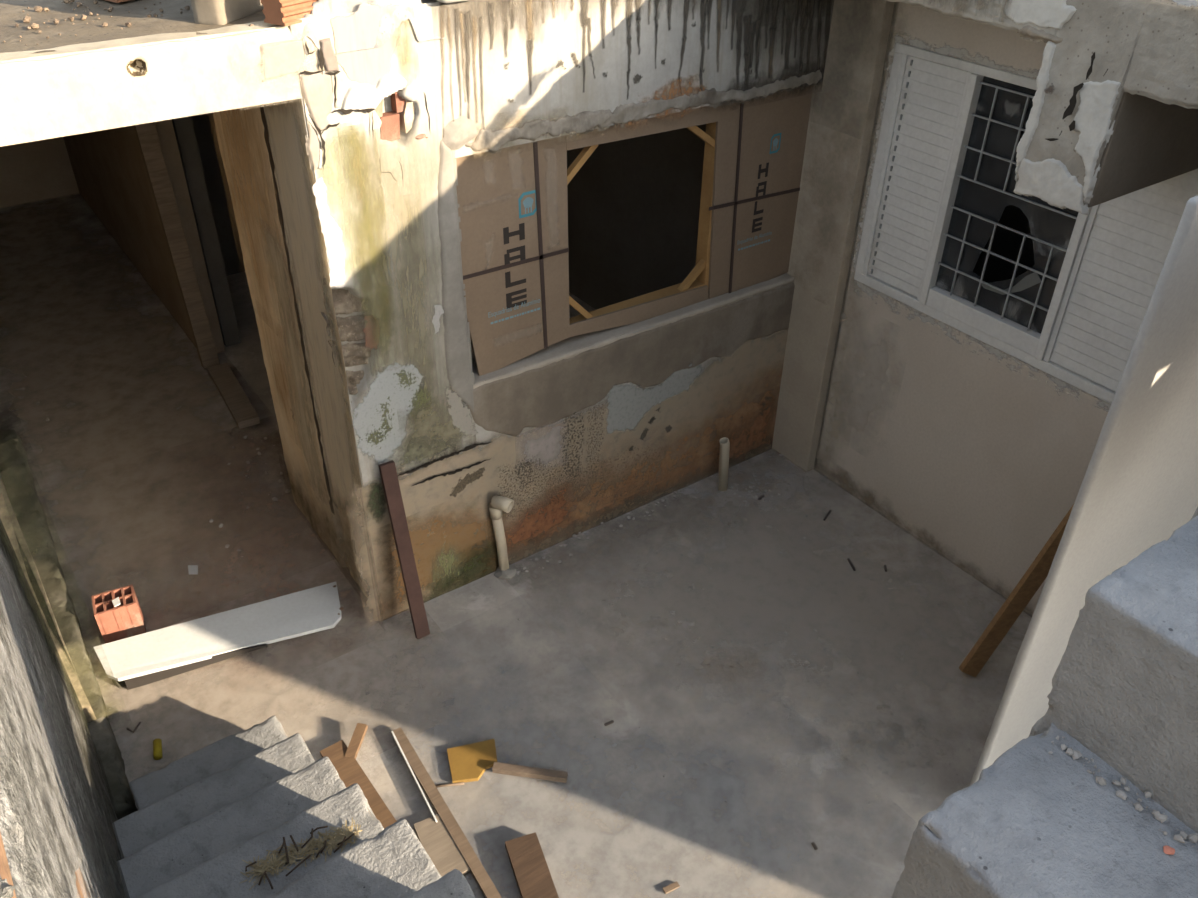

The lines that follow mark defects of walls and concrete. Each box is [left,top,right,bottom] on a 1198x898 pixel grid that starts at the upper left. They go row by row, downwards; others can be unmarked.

damp [440,0,832,124]
peeling [1000,0,1121,215]
crack [1046,52,1108,141]
peeling [259,3,428,515]
damp [348,127,390,354]
crack [398,442,491,486]
damp [398,329,809,601]
peeling [607,363,702,433]
damp [355,483,409,622]